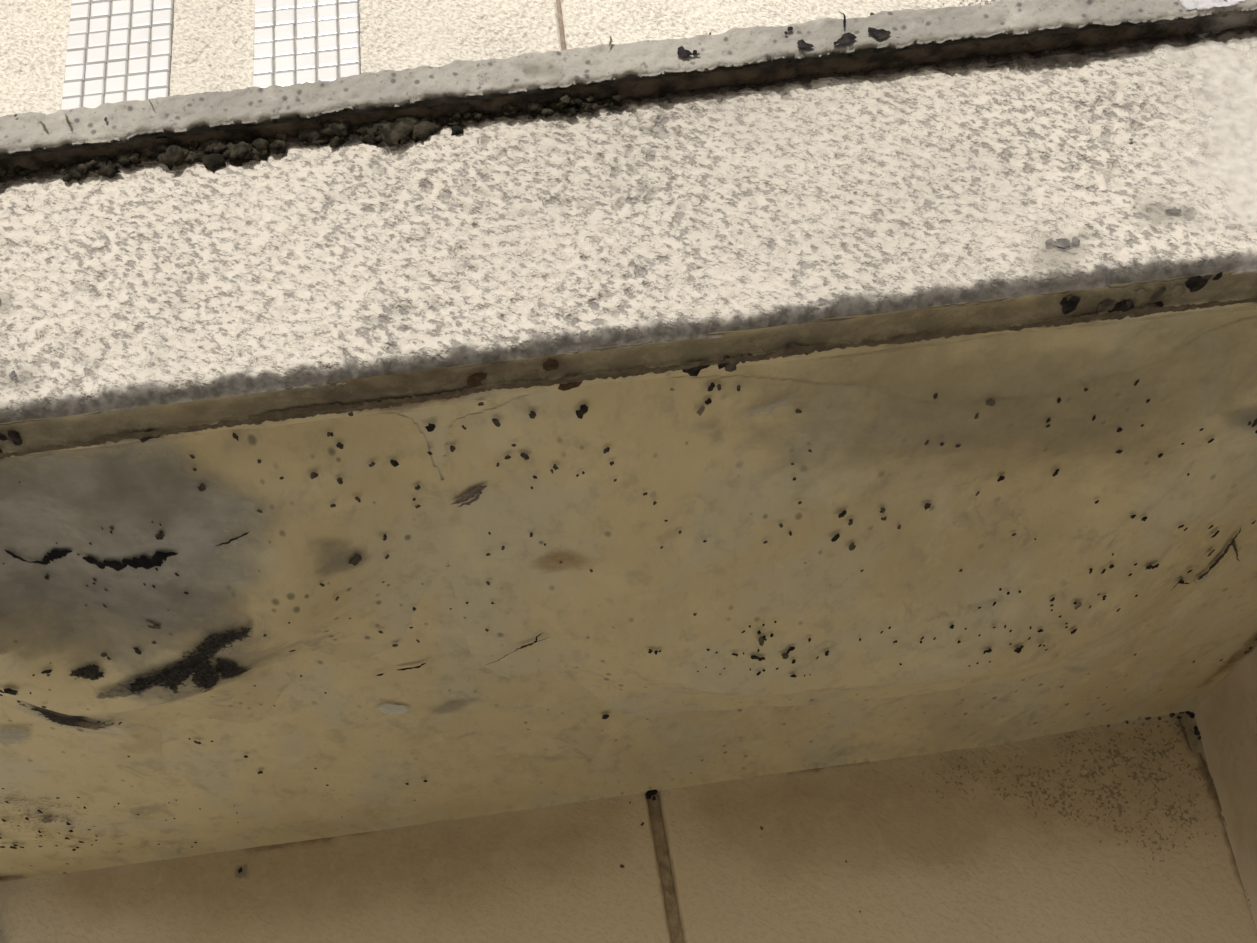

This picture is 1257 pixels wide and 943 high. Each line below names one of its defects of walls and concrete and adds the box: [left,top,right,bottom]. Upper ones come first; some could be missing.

water stain [576,404,588,419]
water stain [0,429,263,630]
water stain [831,510,856,551]
peeling [69,627,252,699]
water stain [706,621,811,678]
peeling [0,688,123,730]
water stain [1,788,98,851]